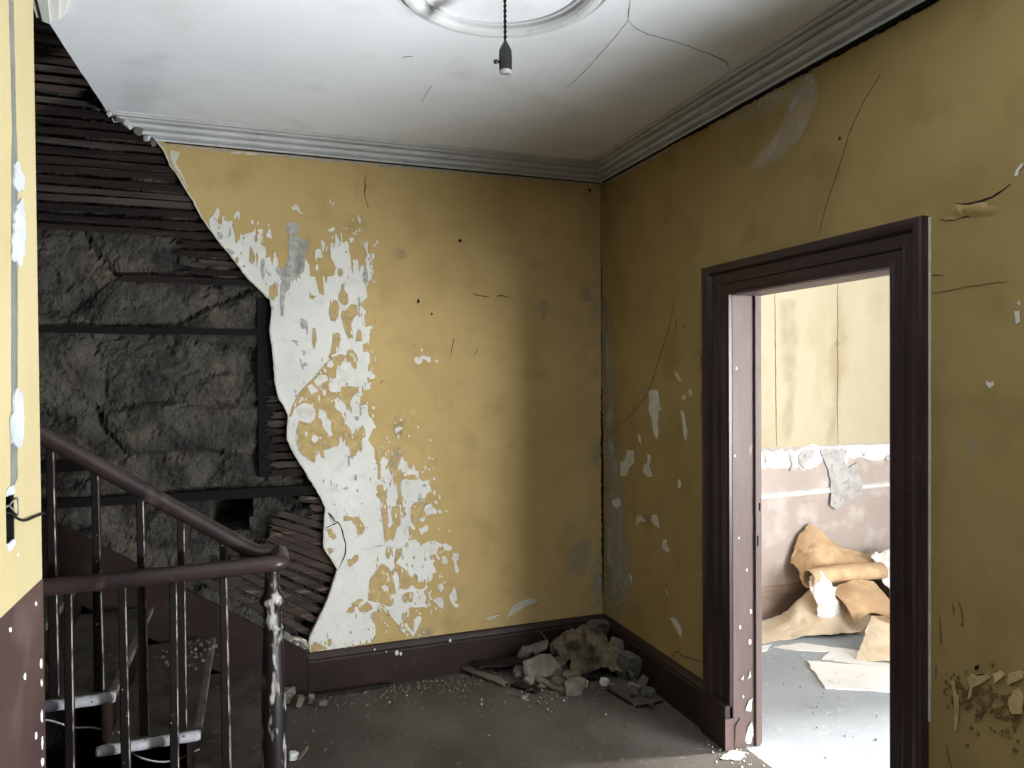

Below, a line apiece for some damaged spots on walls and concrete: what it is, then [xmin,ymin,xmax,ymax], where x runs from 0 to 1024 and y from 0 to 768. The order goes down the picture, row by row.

crack [165,0,939,612]
peeling [106,112,459,656]
peeling [648,390,662,439]
peeling [675,373,692,440]
peeling [620,434,652,477]
peeling [635,514,659,528]
peeling [725,695,754,752]
spalling [943,663,1024,754]